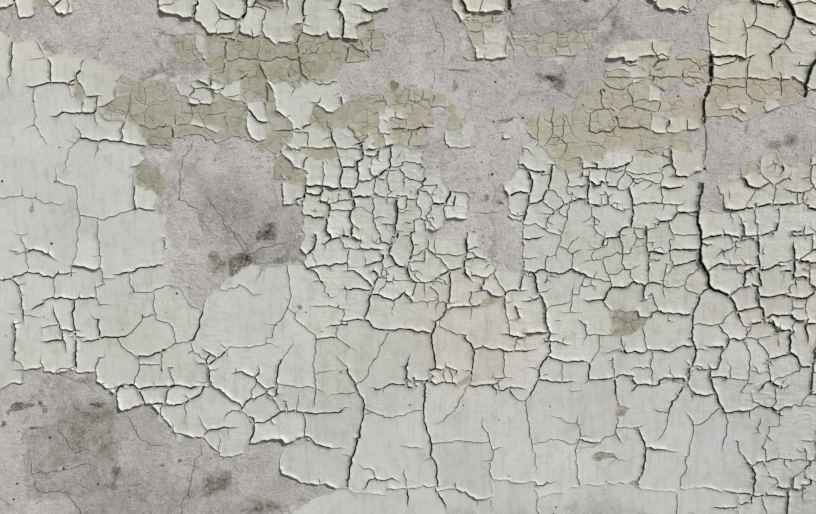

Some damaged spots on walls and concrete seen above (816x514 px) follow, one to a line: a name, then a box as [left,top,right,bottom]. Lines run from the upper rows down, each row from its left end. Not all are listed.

crack [7,42,83,140]
peeling [0,32,144,280]
peeling [0,0,309,113]
crack [54,0,323,168]
crack [331,0,376,61]
crack [395,69,435,116]
crack [446,0,512,57]
peeling [255,0,816,310]
crack [537,109,581,159]
crack [584,0,816,170]
peeling [0,73,446,514]
crack [3,120,816,514]